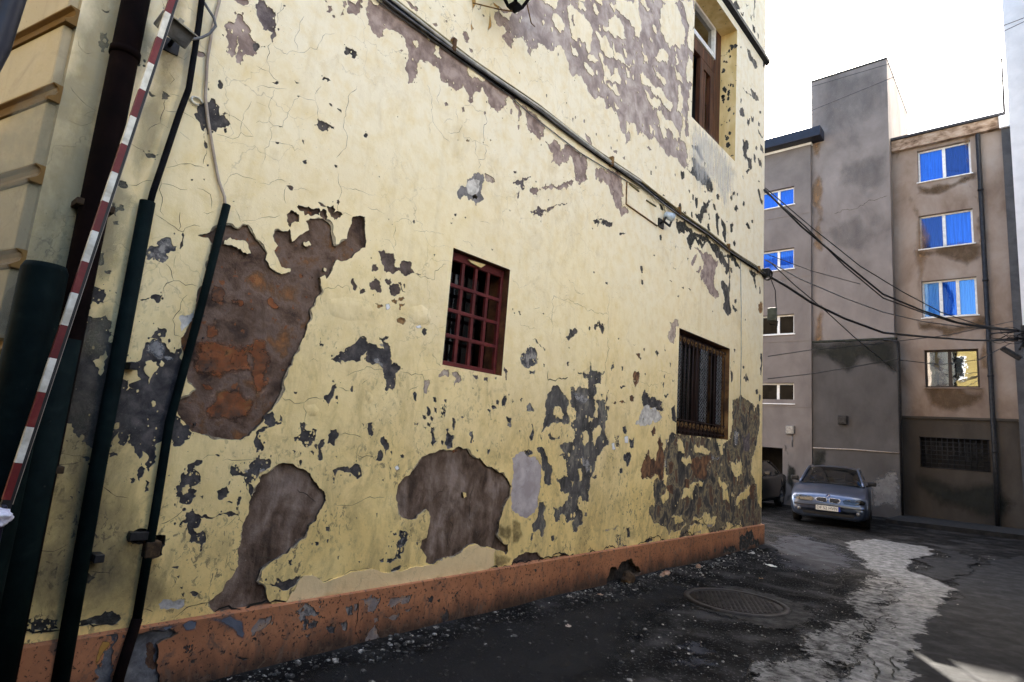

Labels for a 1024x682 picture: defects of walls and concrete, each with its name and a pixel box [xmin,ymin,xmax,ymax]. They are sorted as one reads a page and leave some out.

crack [131,3,335,336]
peeling [325,0,629,235]
peeling [476,0,765,321]
peeling [66,257,117,465]
spalling [107,200,421,641]
peeling [380,319,763,572]
peeling [25,618,58,640]
spalling [80,611,195,682]
peeling [283,591,459,641]
spalling [606,558,641,582]